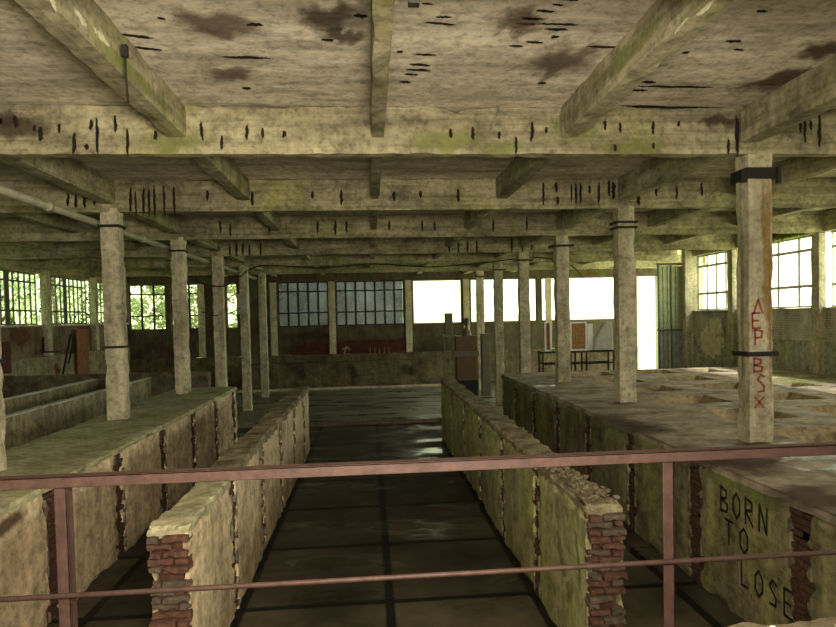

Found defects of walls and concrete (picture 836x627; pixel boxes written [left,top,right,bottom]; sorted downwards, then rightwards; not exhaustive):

damp [178,13,253,37]
damp [305,3,362,43]
damp [504,10,539,33]
damp [211,68,248,79]
damp [540,52,587,78]
spalling [788,507,816,623]